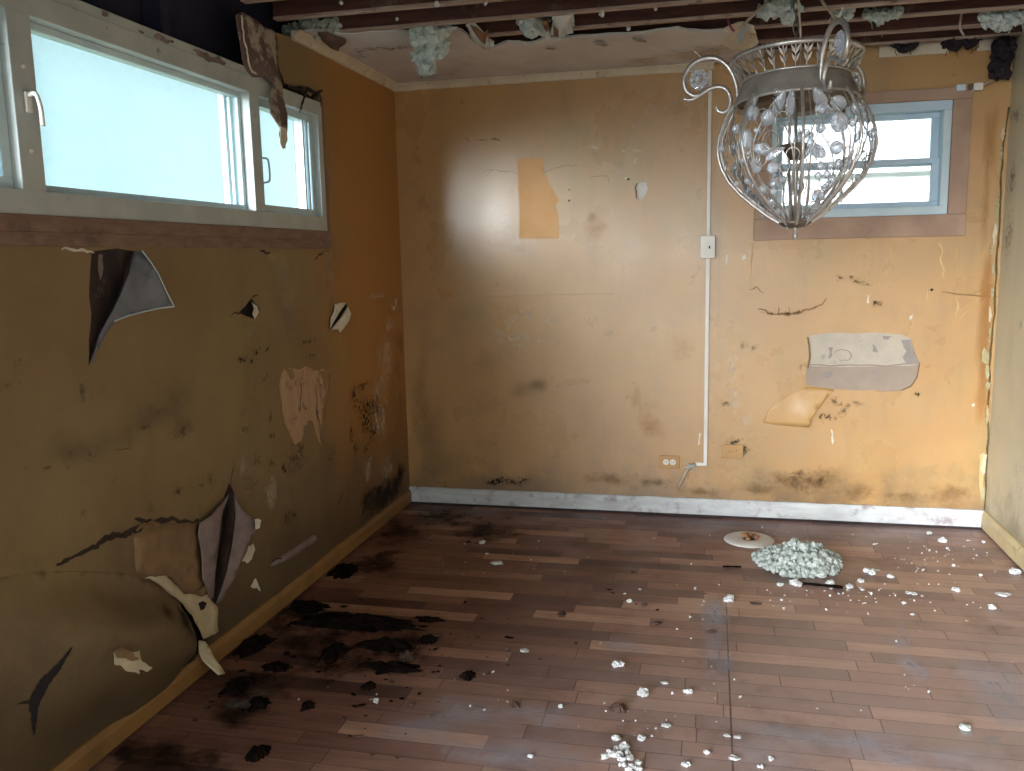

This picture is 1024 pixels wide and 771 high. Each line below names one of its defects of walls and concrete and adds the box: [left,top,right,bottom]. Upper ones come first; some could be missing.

peeling [318,32,346,51]
crack [750,287,827,316]
spalling [806,332,920,391]
peeling [279,366,330,445]
crack [56,516,199,566]
peeling [133,523,225,675]
peeling [113,648,152,674]
crack [16,647,73,735]